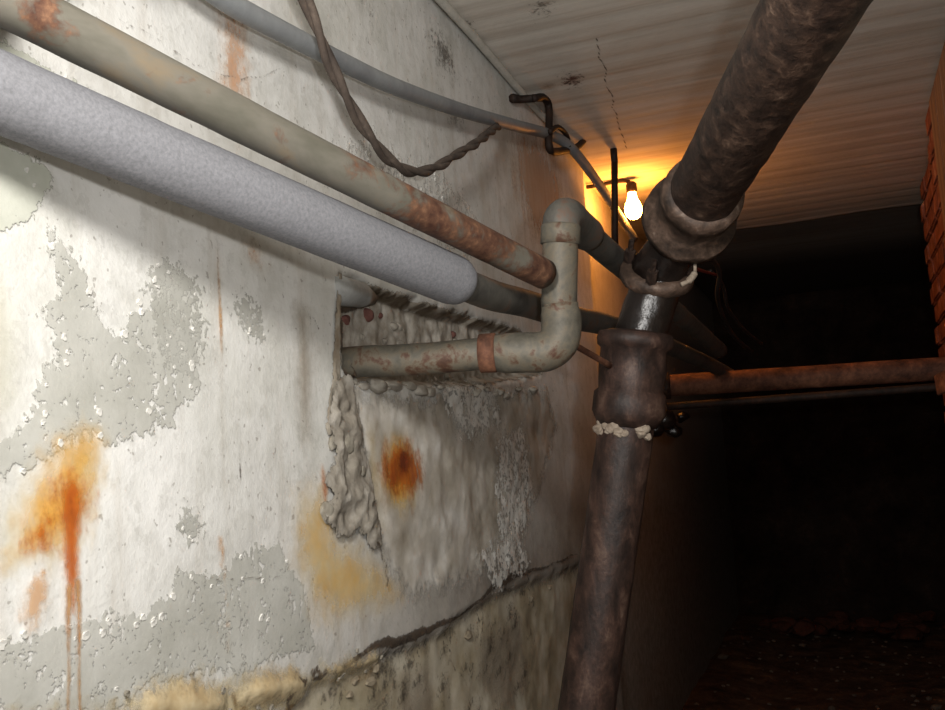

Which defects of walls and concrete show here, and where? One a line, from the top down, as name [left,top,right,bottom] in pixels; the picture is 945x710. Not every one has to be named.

peeling [0,142,53,231]
peeling [0,226,210,482]
peeling [227,285,266,344]
corrosion [22,444,93,653]
peeling [0,537,316,710]
damp [214,666,356,710]
damp [306,508,381,605]
corrosion [383,442,422,502]
crack [287,554,573,710]
flaking render [291,273,578,710]